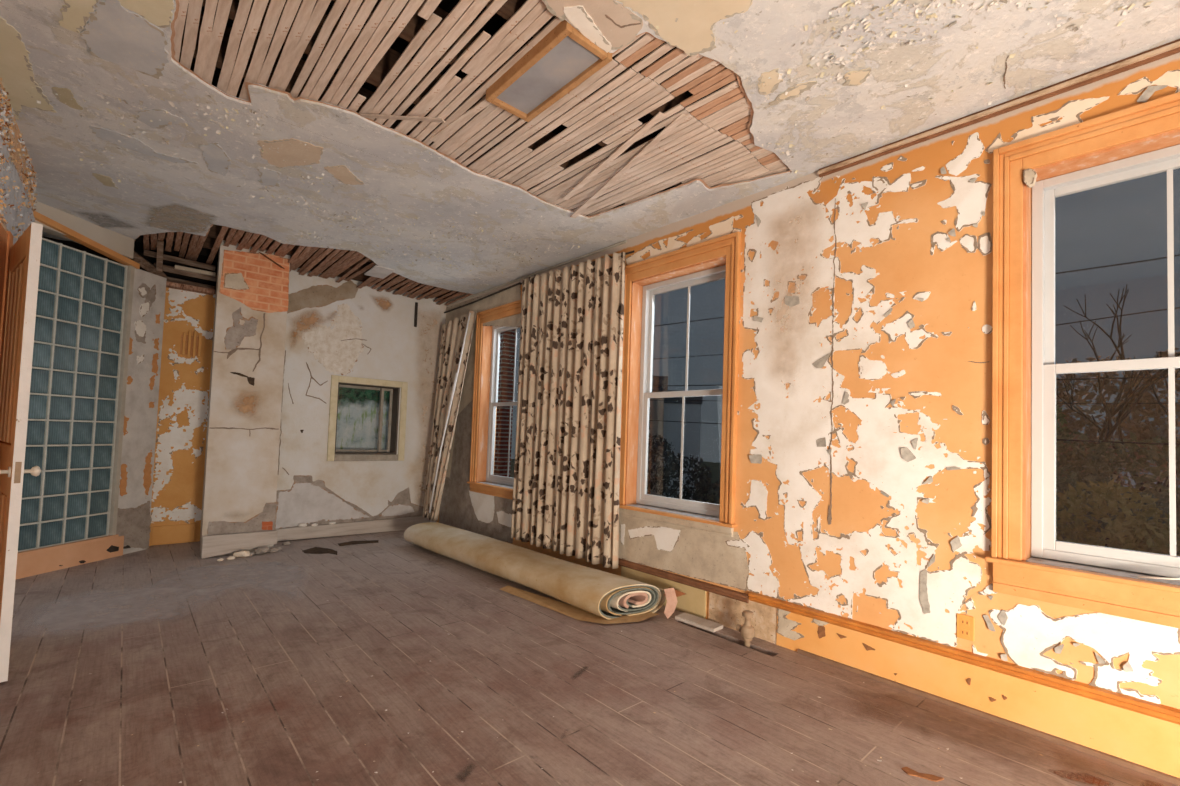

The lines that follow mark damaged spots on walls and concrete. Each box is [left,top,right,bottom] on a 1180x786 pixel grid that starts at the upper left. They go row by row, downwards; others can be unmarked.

peeling [757,0,1083,109]
crack [210,313,327,475]
peeling [619,70,1180,704]